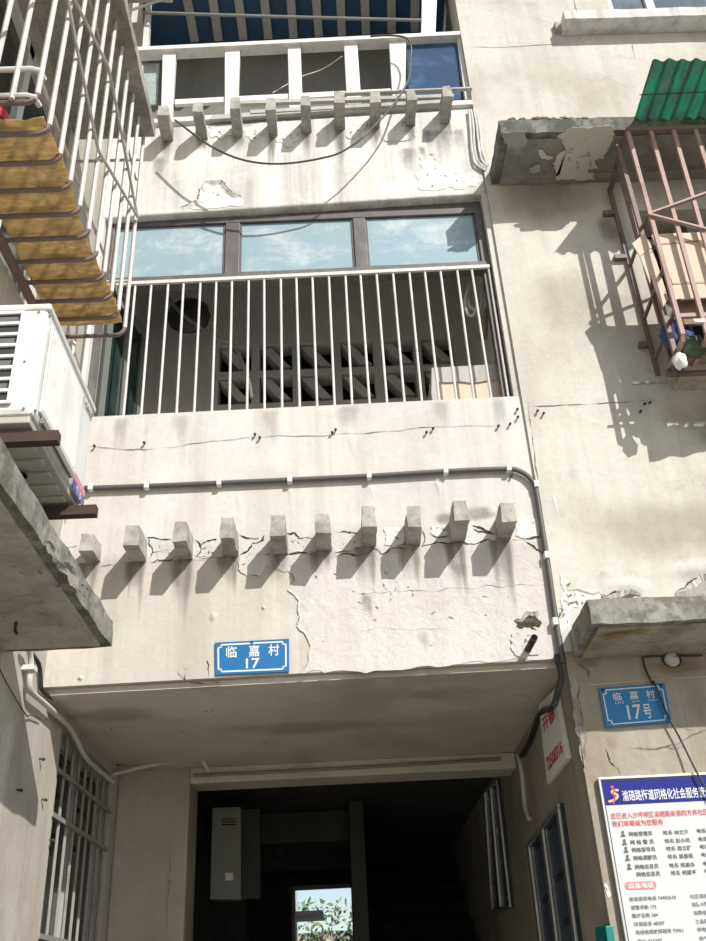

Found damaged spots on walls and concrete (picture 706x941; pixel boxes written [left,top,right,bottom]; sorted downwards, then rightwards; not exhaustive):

peeling [502,131,528,149]
peeling [529,125,615,181]
spalling [181,177,244,210]
crack [195,535,264,558]
crack [287,525,543,556]
peeling [238,517,640,674]
spalling [675,574,706,596]